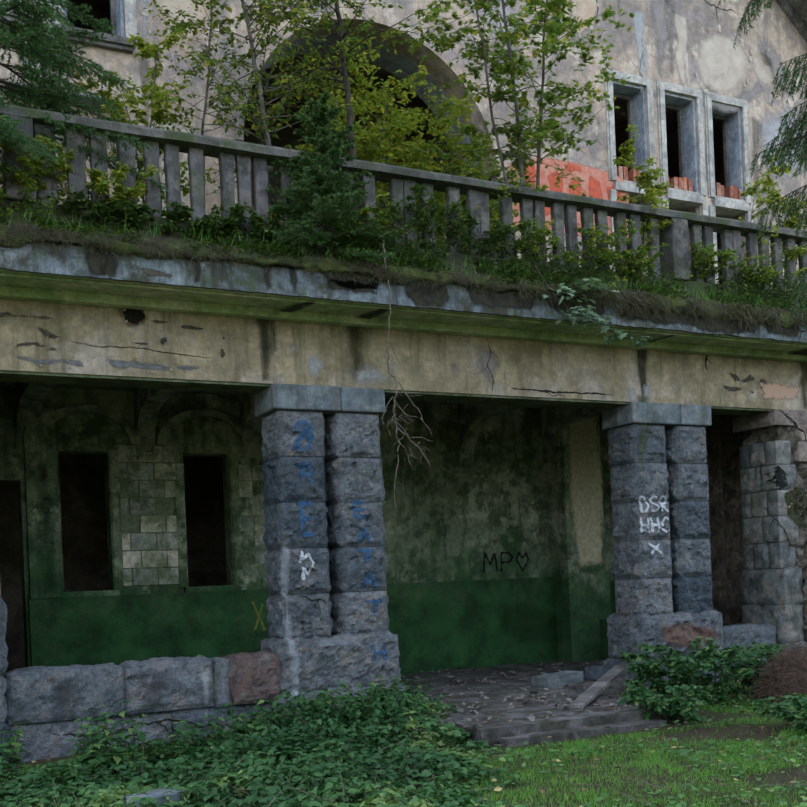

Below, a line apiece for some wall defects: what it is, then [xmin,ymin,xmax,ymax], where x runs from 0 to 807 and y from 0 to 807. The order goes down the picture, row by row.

spalling [119,308,168,326]
crack [72,339,210,358]
spalling [108,355,198,373]
crack [473,339,499,391]
crack [512,388,611,396]
flaking render [723,372,800,400]
spalling [763,466,807,529]